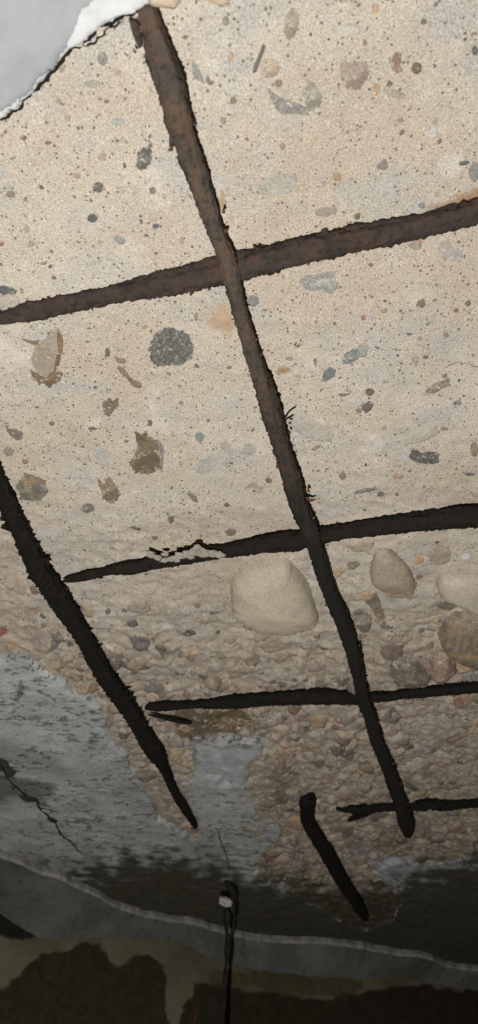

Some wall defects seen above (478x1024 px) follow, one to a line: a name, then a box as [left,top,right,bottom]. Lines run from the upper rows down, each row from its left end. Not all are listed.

spalling [0,0,225,325]
spalling [128,0,478,922]
spalling [0,286,358,839]
crack [0,758,84,856]
corrosion [175,709,247,740]
leakage [195,743,260,791]
leakage [0,914,34,940]
leakage [66,842,478,965]